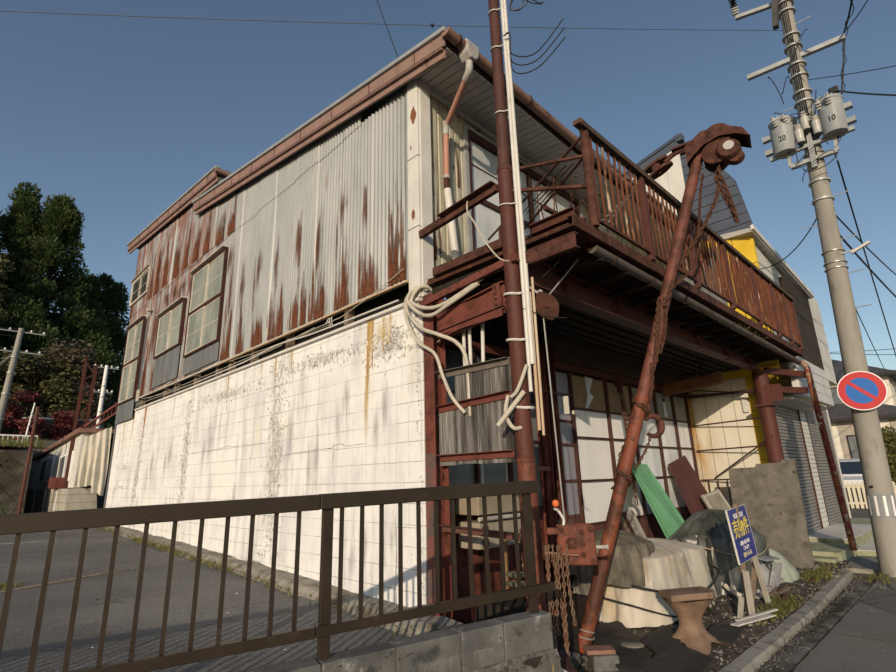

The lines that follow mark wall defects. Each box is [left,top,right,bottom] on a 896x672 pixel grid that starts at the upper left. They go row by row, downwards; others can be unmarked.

rust [146,190,237,307]
rust [220,187,415,361]
rust [432,197,442,260]
rust [140,313,158,396]
rust [365,319,373,413]